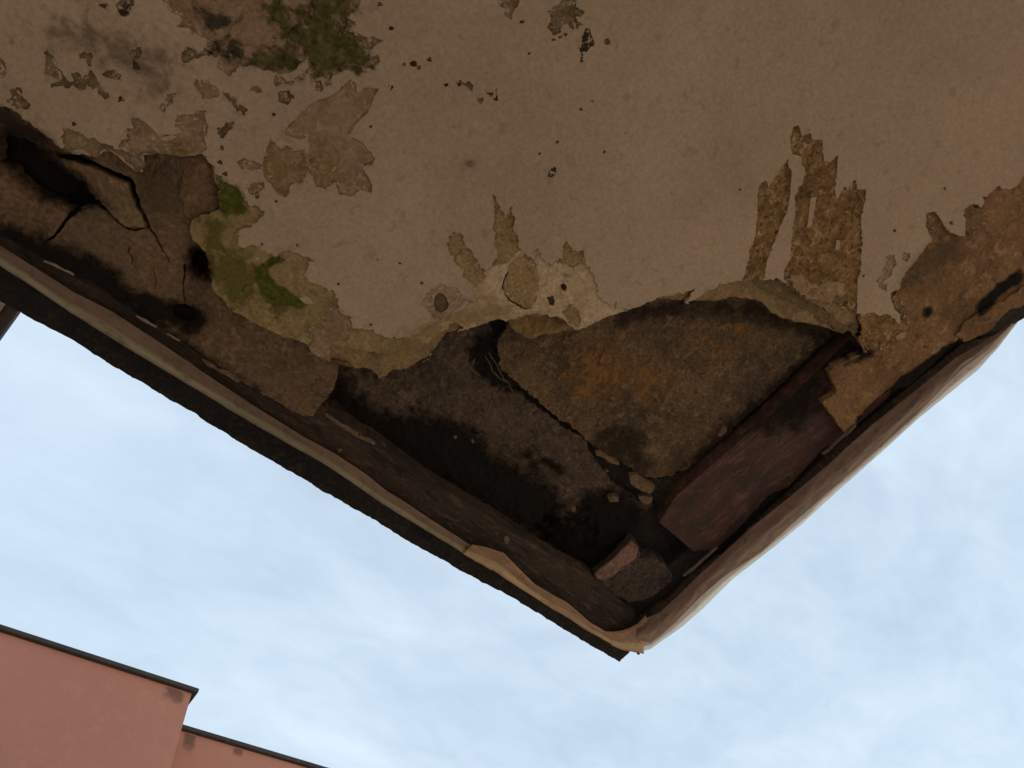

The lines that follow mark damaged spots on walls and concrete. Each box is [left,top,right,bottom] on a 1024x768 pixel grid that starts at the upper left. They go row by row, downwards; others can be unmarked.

leakage [192,0,375,86]
crack [51,205,109,239]
crack [60,154,151,252]
spalling [0,0,626,416]
spalling [658,125,1024,432]